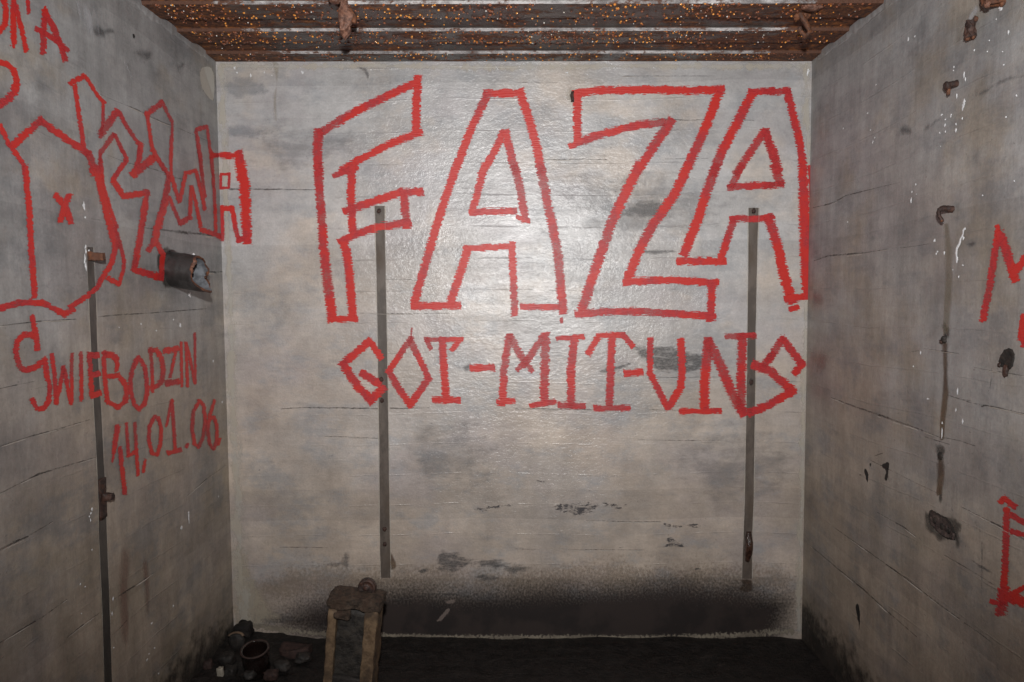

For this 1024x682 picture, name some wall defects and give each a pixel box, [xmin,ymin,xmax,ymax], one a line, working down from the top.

rust [939,340,948,440]
spalling [926,510,960,546]
damp [253,600,329,638]
damp [381,553,867,682]